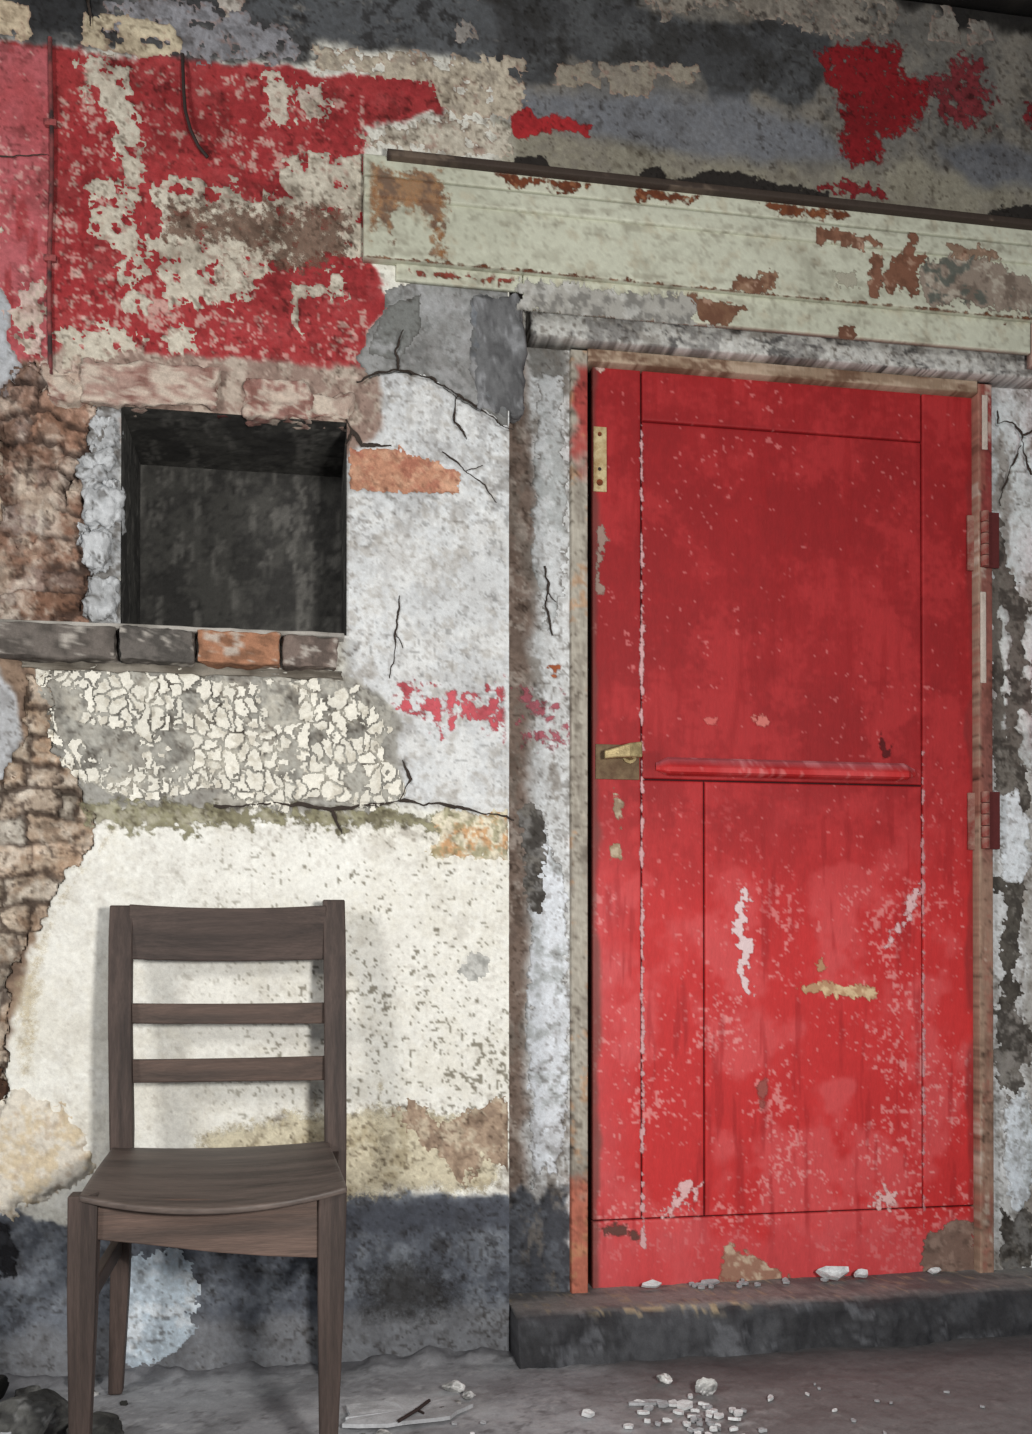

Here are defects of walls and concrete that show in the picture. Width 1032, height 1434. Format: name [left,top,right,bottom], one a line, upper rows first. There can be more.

peeling [645,0,1000,200]
flaking render [0,0,593,631]
peeling [816,226,1032,318]
crack [345,419,392,447]
crack [356,329,513,502]
crack [214,760,514,833]
peeling [0,665,570,1104]
peeling [731,887,754,995]
spalling [992,510,1032,1269]
damp [197,1101,324,1148]
damp [346,1106,500,1198]
peeling [391,1096,508,1189]